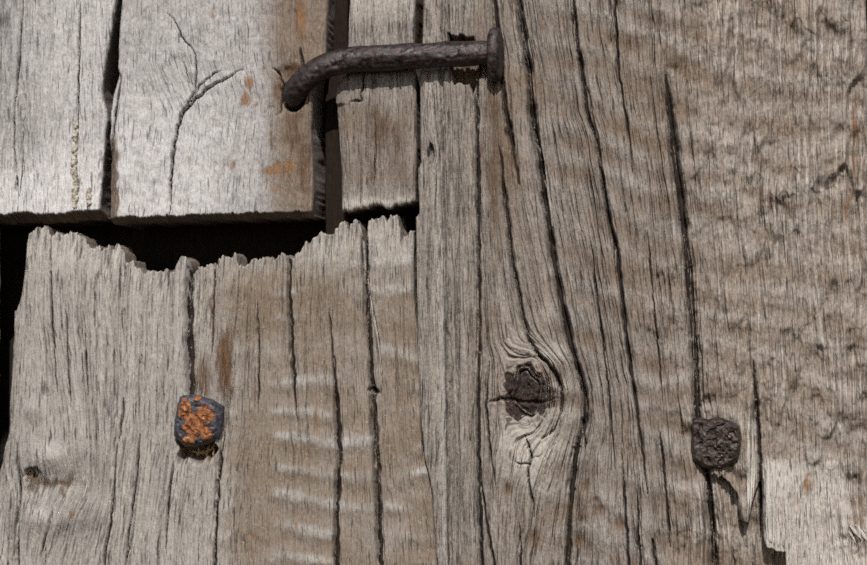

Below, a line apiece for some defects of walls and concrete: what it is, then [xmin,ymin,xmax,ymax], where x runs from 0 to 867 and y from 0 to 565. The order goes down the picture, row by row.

crack [167,13,243,214]
rust [216,330,232,391]
rust [178,364,215,446]